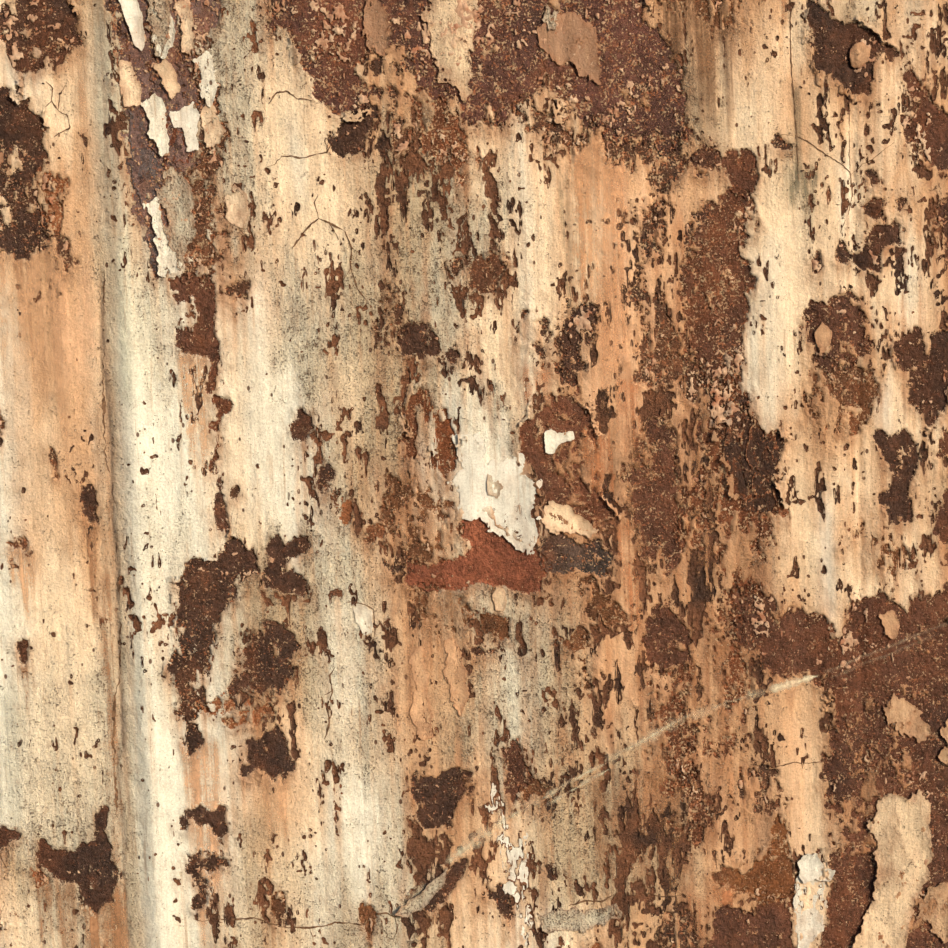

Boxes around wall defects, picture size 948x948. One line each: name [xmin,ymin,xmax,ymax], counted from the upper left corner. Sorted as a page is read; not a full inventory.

crack [268,90,312,104]
peeling [420,0,479,101]
crack [268,145,331,167]
rust [232,175,282,272]
crack [292,196,367,301]
peeling [447,429,599,555]
rust [359,601,403,726]
crack [750,760,825,768]
peeling [883,693,948,765]
rust [250,833,336,946]
rust [292,758,345,885]
peeling [852,789,948,948]